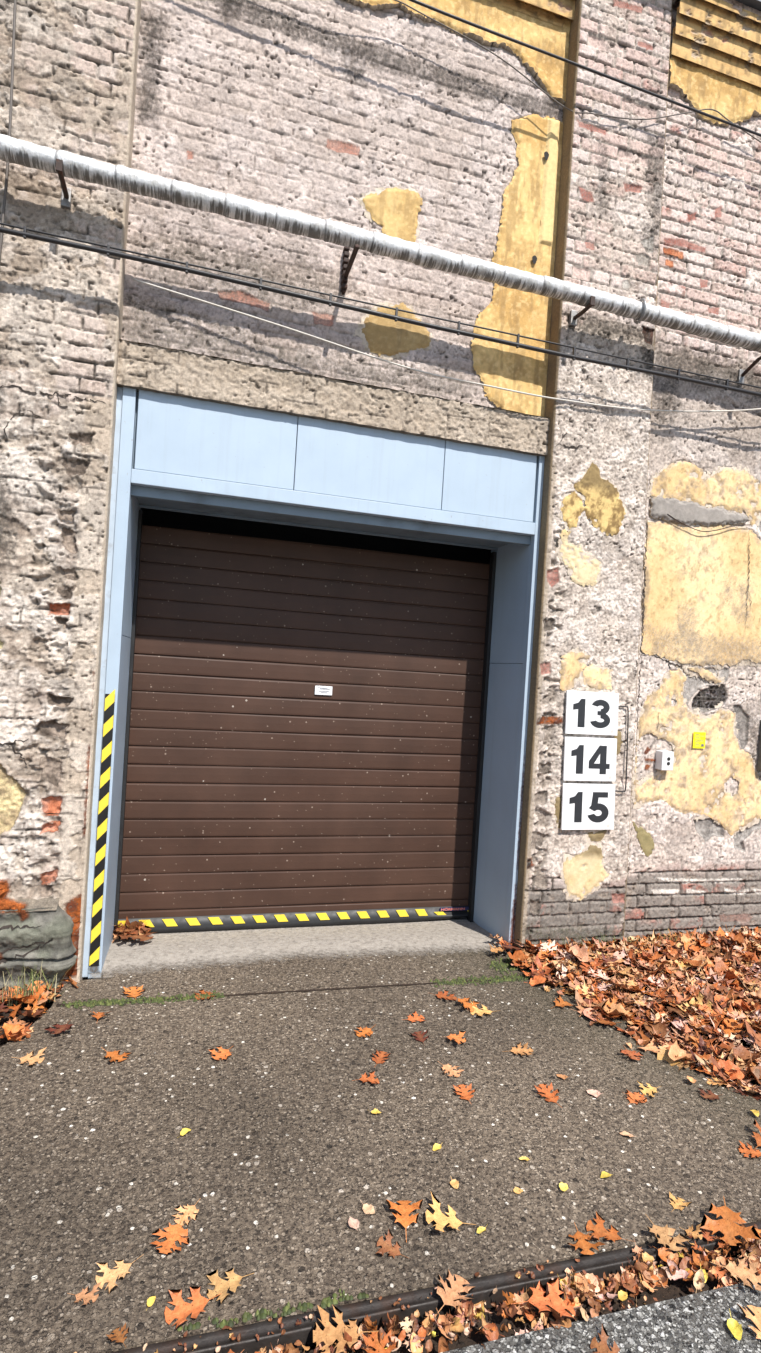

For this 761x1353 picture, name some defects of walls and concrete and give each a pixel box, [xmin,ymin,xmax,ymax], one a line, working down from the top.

peeling [668,51,761,127]
peeling [343,0,606,277]
peeling [353,302,434,362]
peeling [470,283,552,417]
spalling [63,433,95,475]
peeling [547,461,627,588]
spalling [49,509,79,629]
peeling [614,460,761,857]
spalling [33,694,73,738]
spalling [40,757,62,834]
spalling [531,790,562,846]
peeling [530,830,625,915]